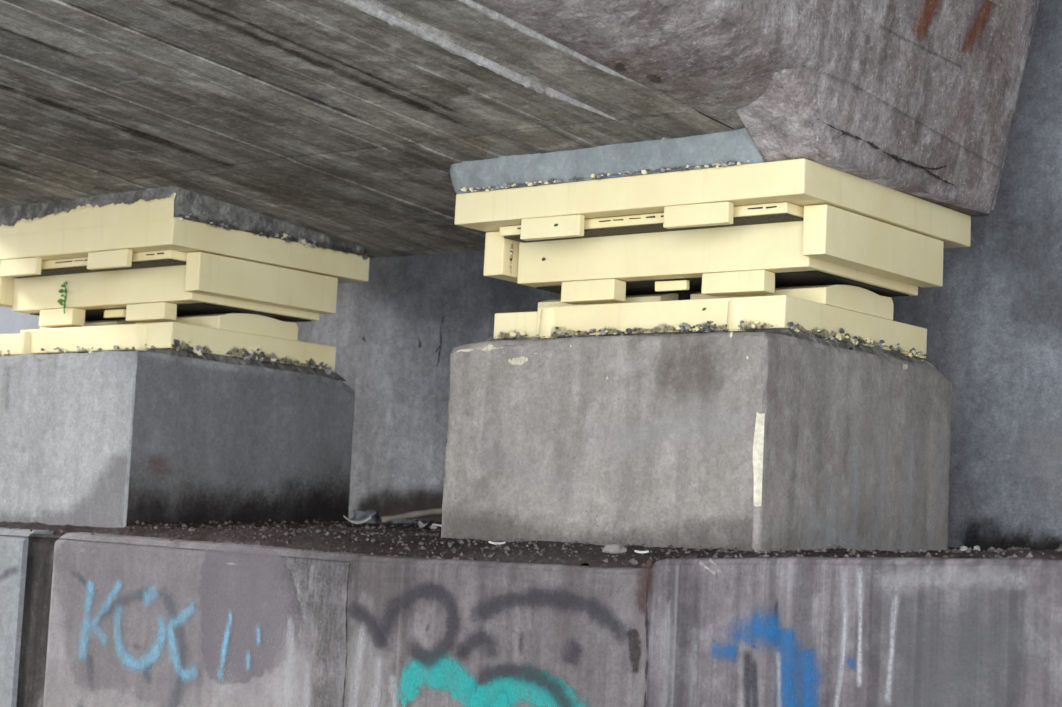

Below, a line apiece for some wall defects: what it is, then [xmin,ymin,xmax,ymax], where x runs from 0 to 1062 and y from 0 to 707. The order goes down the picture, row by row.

crack [823,122,955,186]
water stain [842,574,862,684]
water stain [886,598,897,698]